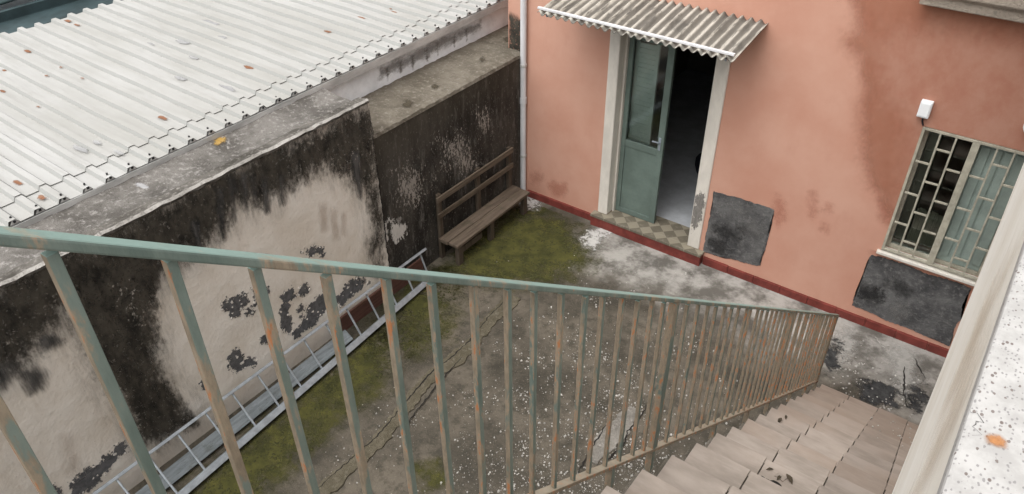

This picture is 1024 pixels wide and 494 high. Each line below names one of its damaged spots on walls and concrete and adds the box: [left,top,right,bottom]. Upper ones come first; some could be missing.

leakage [104,109,383,265]
peeling [300,245,325,258]
leakage [0,268,64,395]
leakage [62,253,199,444]
peeling [221,288,257,319]
peeling [227,347,258,374]
peeling [266,276,371,340]
crack [320,302,503,487]
crack [903,359,925,405]
peeling [53,440,128,494]